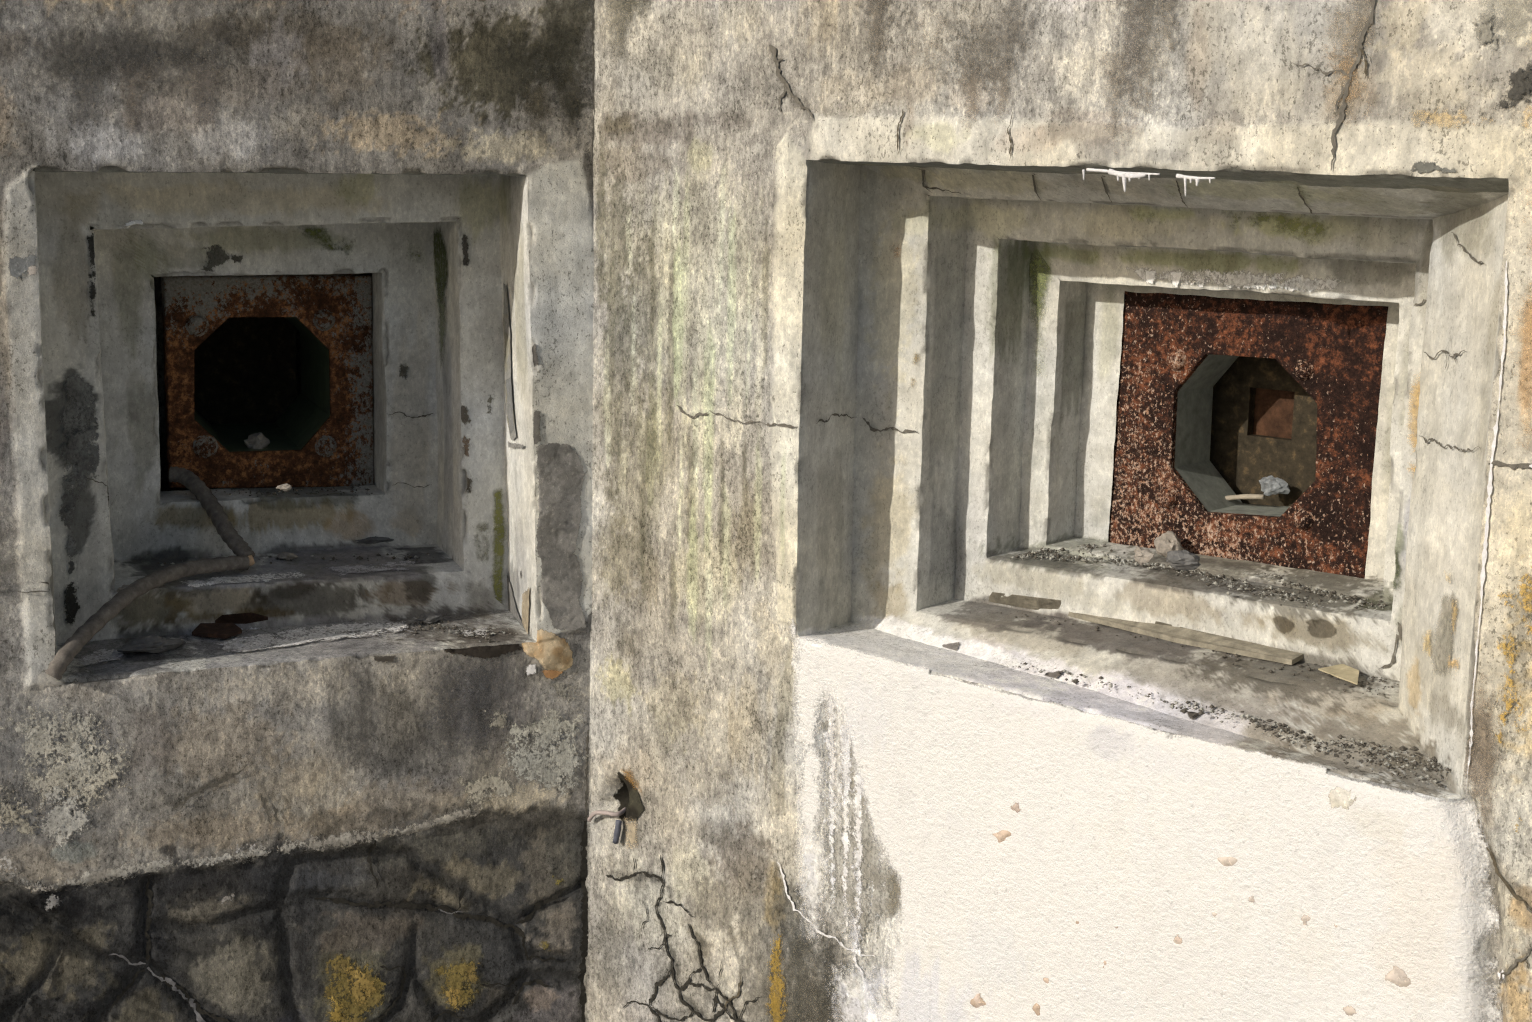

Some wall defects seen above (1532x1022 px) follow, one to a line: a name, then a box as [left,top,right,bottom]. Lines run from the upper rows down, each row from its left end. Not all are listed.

crack [583,0,595,178]
crack [1293,0,1375,170]
crack [677,405,919,434]
crack [1422,232,1532,985]
crack [110,877,229,1022]
crack [173,764,280,824]
crack [314,729,760,1022]